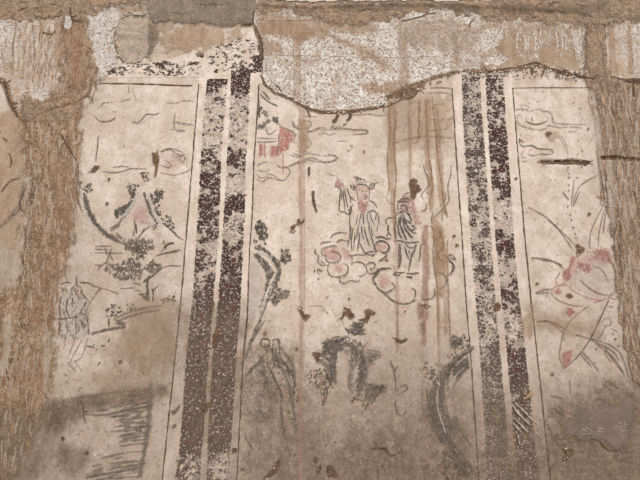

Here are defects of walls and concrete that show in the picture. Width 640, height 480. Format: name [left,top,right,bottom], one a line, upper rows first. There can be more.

flaking render [0,14,72,125]
flaking render [86,1,160,84]
flaking render [253,3,593,127]
flaking render [594,17,640,84]
leakage [387,106,397,231]
leakage [418,101,446,212]
leakage [433,230,451,335]